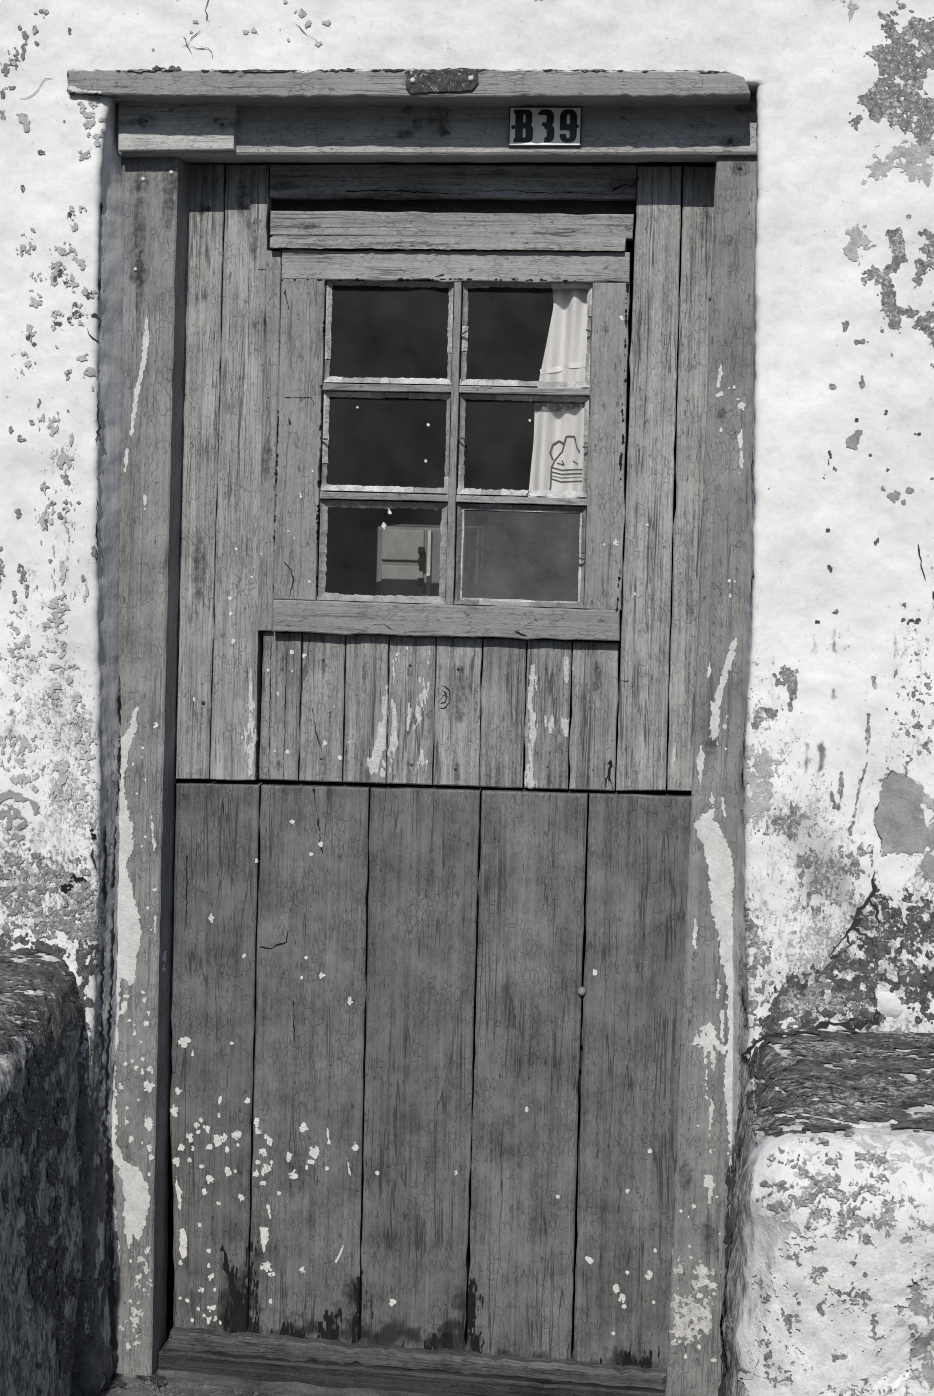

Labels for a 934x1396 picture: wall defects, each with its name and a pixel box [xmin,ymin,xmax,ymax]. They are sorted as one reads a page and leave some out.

peeling [842,0,859,21]
peeling [849,0,934,188]
peeling [842,214,934,367]
spalling [0,789,40,847]
peeling [30,828,103,944]
crack [827,771,921,959]
flaking render [873,651,934,882]